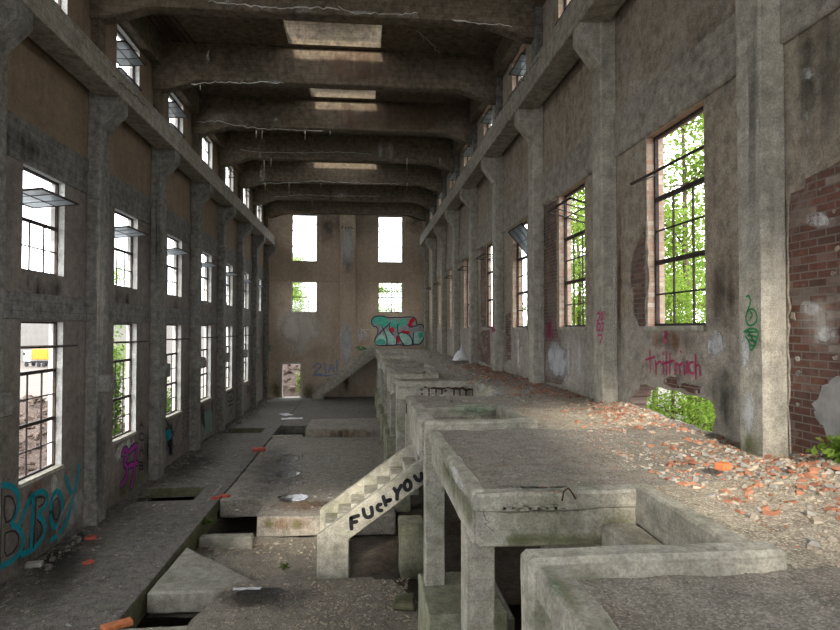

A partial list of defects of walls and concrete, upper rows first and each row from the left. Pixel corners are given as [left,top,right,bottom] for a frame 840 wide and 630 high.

flaking render [629,220,650,333]
flaking render [786,154,840,457]
flaking render [662,373,706,396]